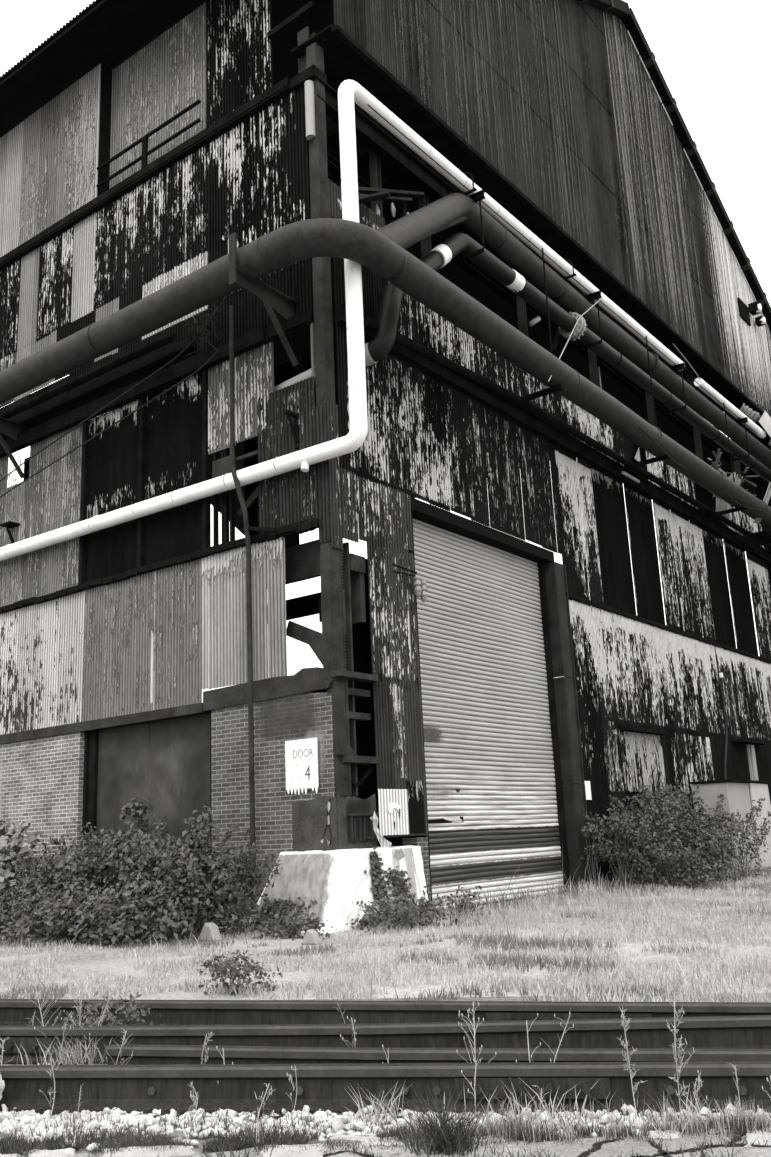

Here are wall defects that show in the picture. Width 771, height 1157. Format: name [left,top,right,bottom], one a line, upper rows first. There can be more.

peeling [0,260,19,371]
peeling [0,342,316,717]
peeling [18,0,305,338]
peeling [396,296,624,466]
peeling [336,356,771,828]